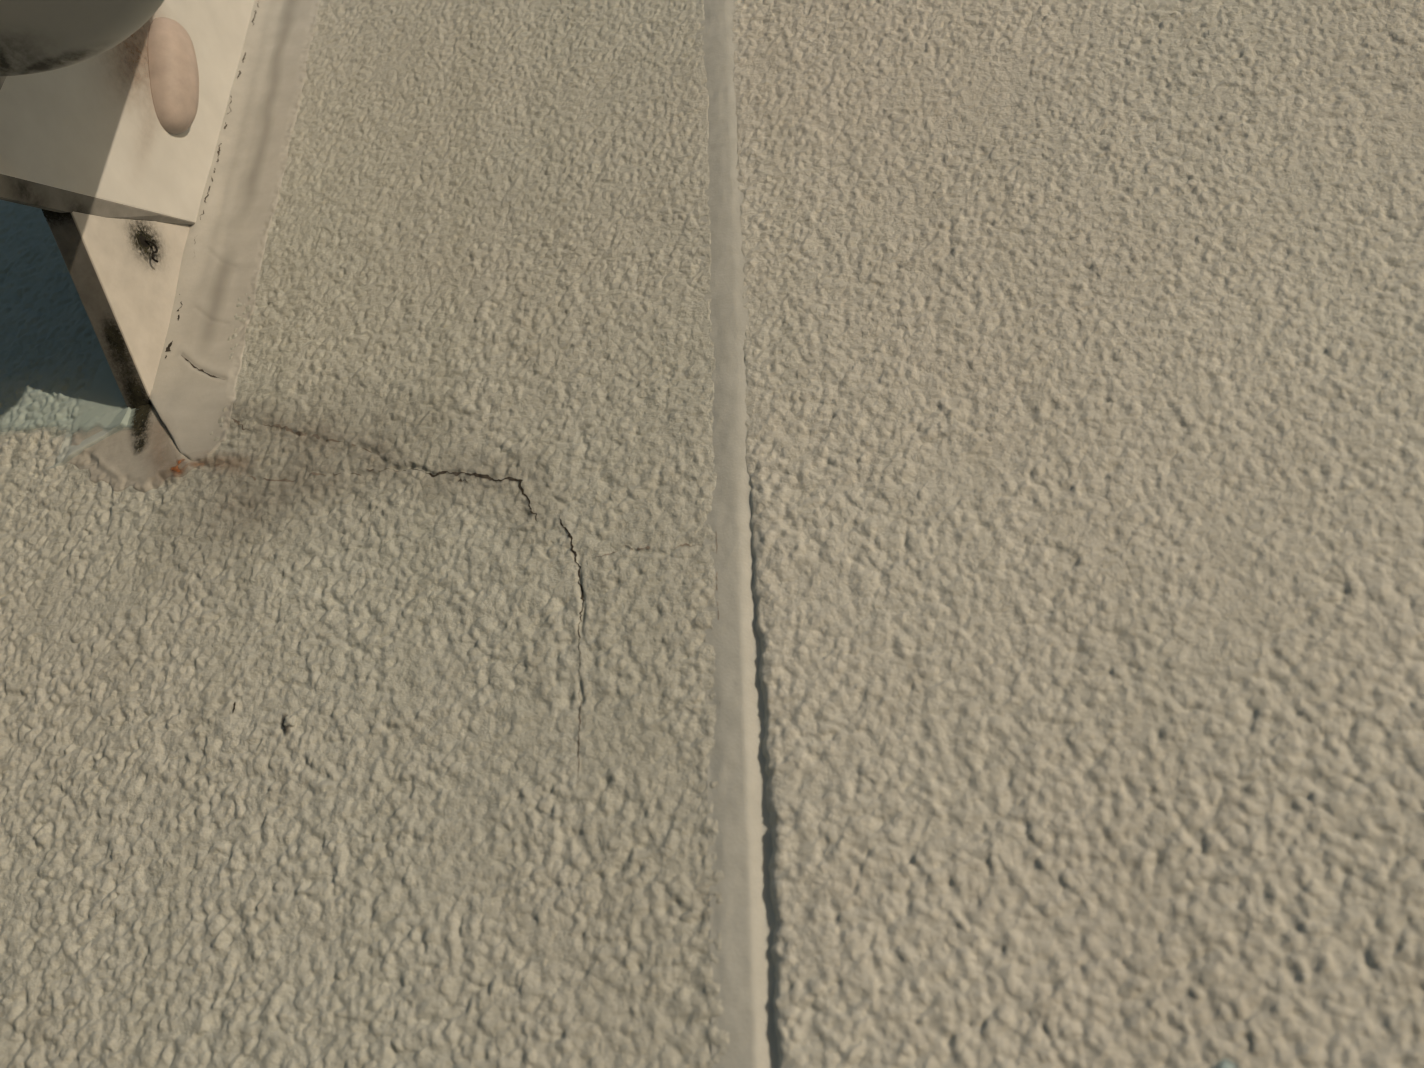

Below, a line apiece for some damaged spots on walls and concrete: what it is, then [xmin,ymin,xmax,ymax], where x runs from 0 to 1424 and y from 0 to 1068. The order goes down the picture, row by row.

crack [201,418,719,784]